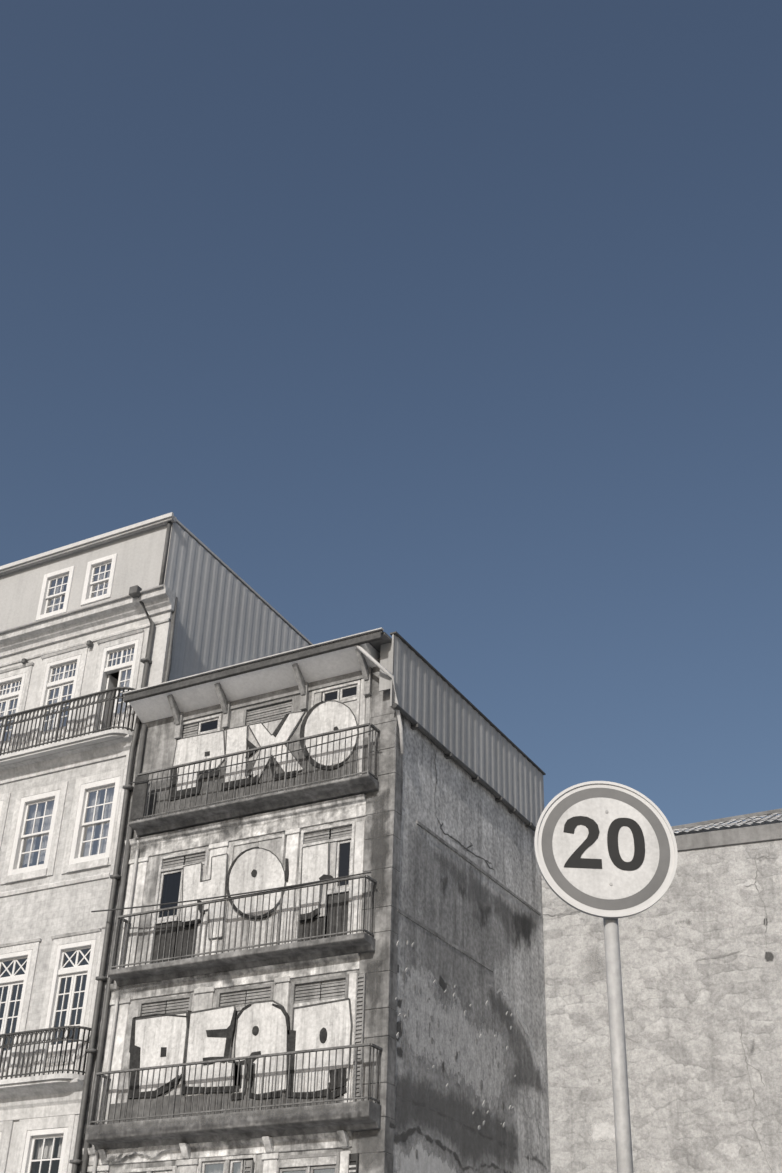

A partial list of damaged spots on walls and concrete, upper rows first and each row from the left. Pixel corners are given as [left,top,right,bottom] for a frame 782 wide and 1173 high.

crack [434,750,494,870]
leakage [441,856,534,942]
leakage [394,1079,542,1173]